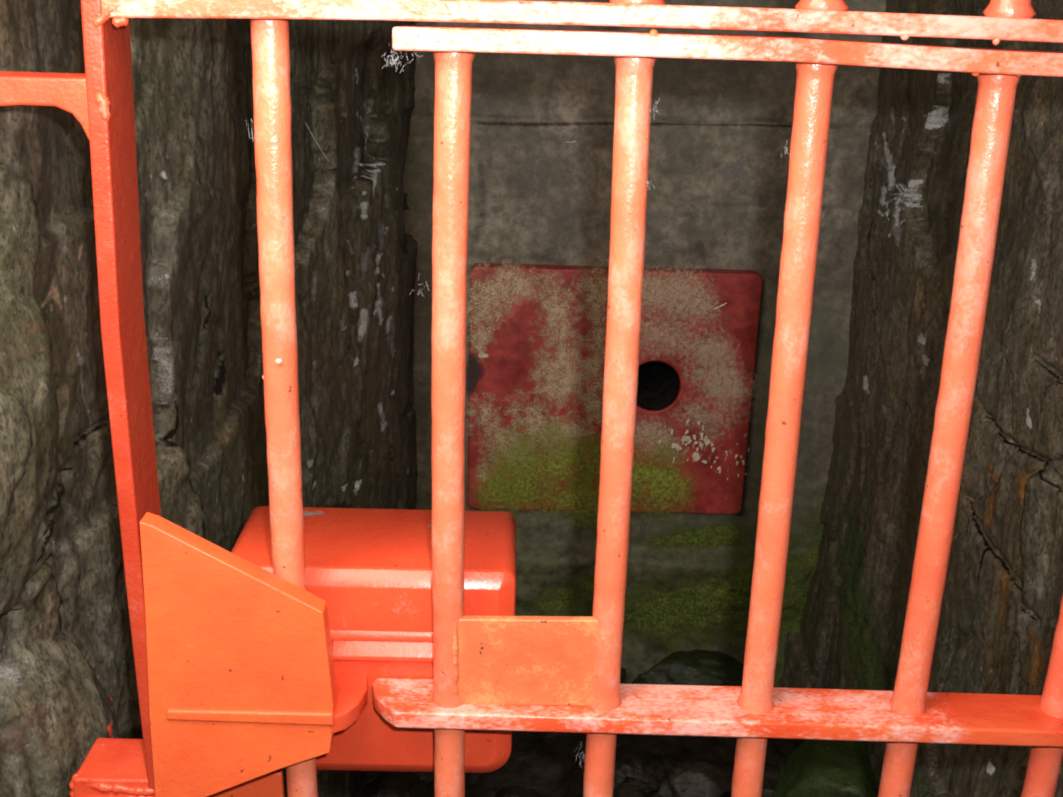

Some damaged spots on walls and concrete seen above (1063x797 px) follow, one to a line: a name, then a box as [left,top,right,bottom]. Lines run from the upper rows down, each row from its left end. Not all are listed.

peeling [634,269,752,480]